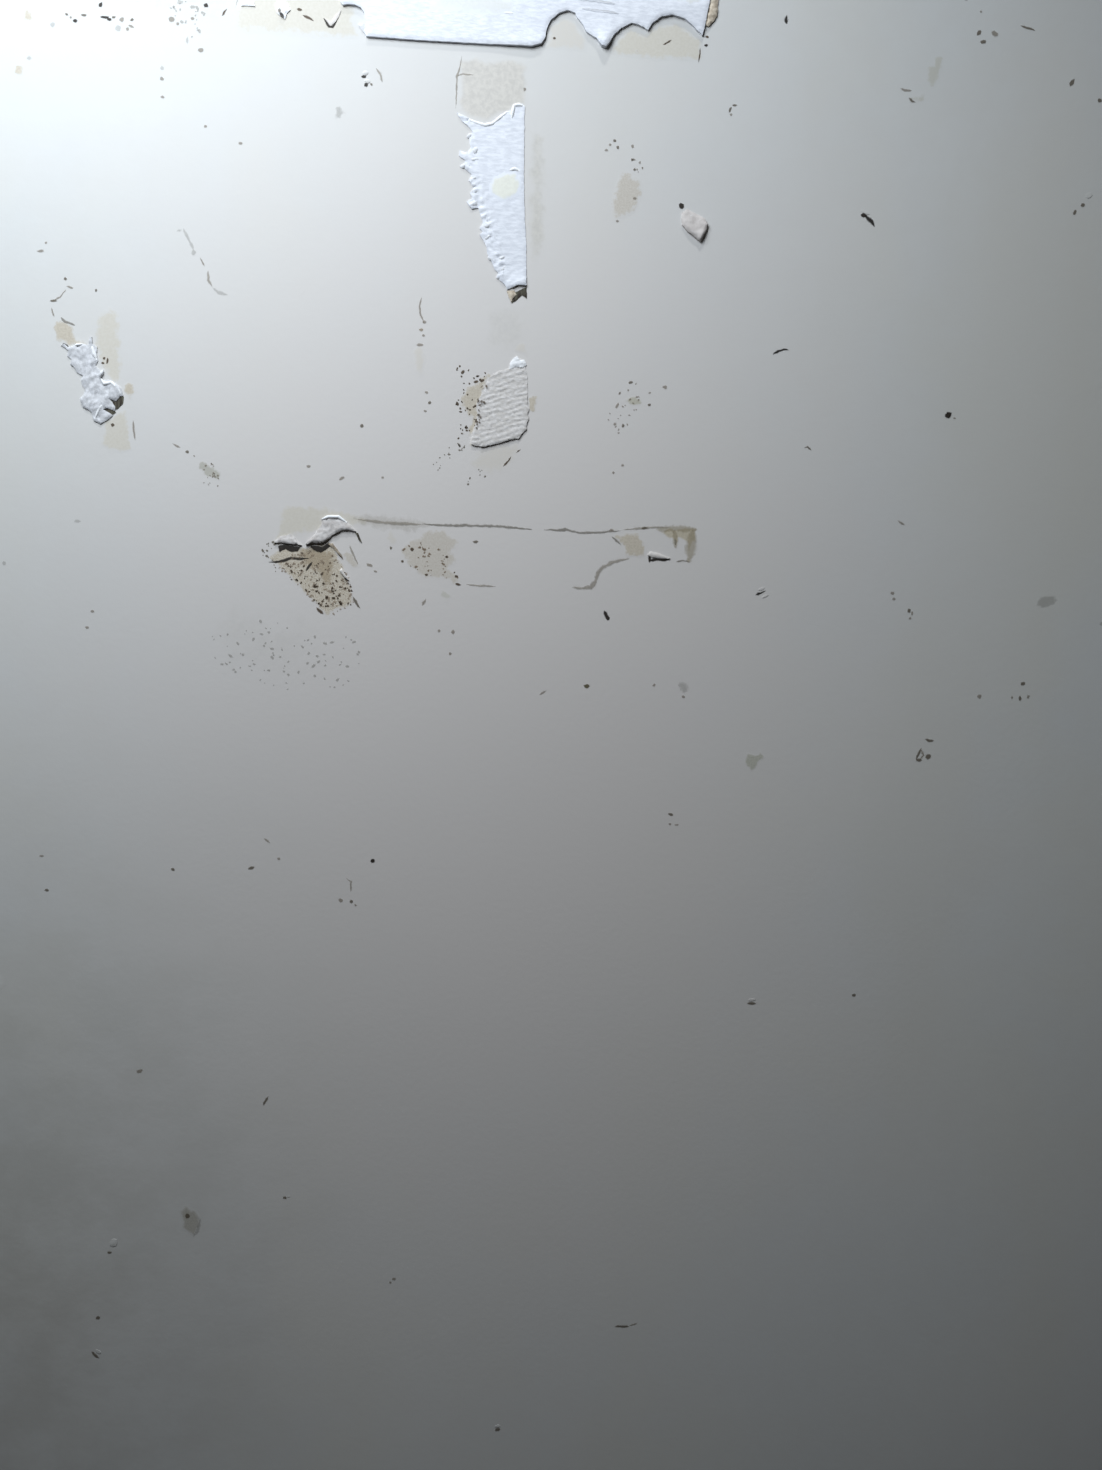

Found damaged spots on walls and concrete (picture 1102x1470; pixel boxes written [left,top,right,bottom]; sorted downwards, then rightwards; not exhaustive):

peeling [324,0,718,49]
peeling [457,103,527,303]
peeling [679,203,708,242]
peeling [50,300,135,455]
peeling [433,339,538,485]
peeling [262,502,370,619]